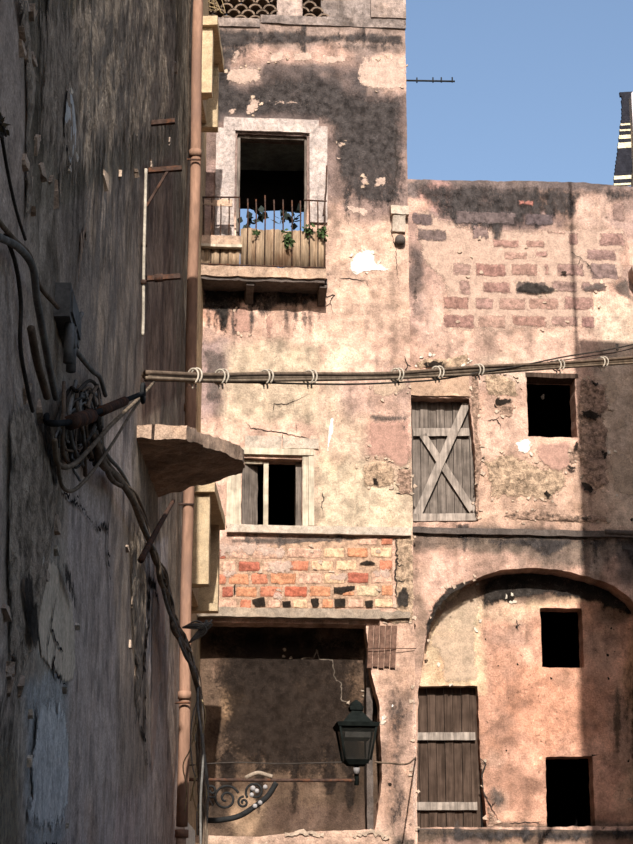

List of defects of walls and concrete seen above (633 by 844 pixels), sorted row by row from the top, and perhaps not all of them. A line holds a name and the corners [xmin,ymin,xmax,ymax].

water stain [218,25,402,212]
water stain [416,185,580,240]
water stain [606,190,632,199]
flaking render [349,248,388,275]
water stain [203,292,317,333]
flaking render [415,352,473,368]
flaking render [369,379,412,403]
flaking render [469,373,615,525]
water stain [498,538,571,555]
water stain [483,573,631,614]